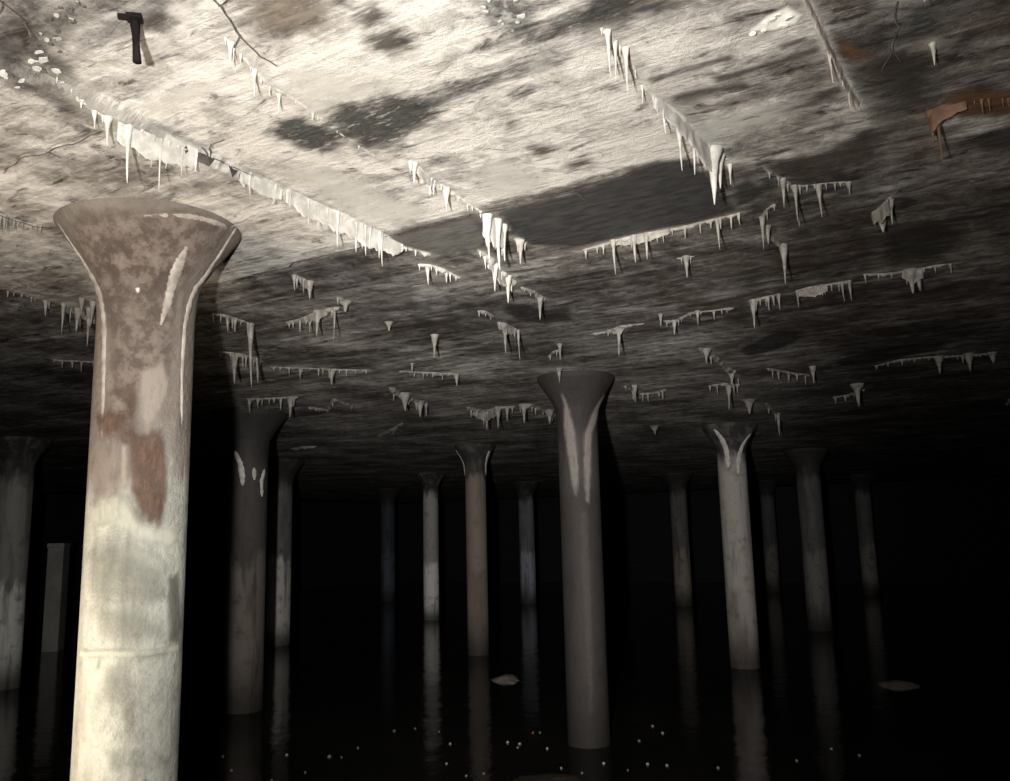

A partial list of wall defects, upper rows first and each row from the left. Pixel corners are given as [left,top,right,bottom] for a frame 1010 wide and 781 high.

crack [213,0,277,67]
water stain [56,76,198,183]
rust [946,89,1010,116]
water stain [224,0,882,358]
water stain [862,197,956,293]
water stain [6,223,107,417]
rust [75,212,224,528]
water stain [623,385,667,402]
water stain [697,348,784,436]
water stain [766,366,816,385]
water stain [832,383,865,407]
water stain [837,343,998,374]